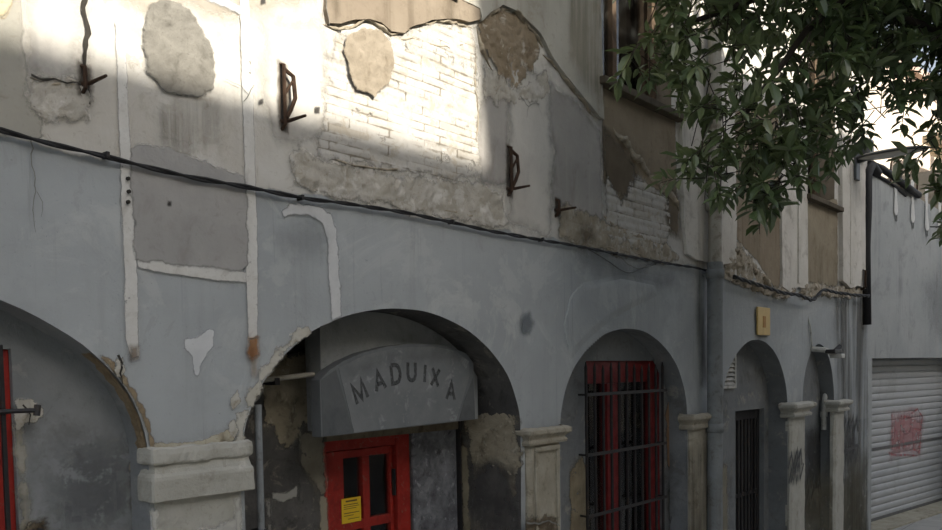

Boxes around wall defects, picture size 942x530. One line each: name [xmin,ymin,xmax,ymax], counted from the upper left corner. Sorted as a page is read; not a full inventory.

flaking render [289,7,596,229]
flaking render [559,127,679,264]
spalling [724,242,862,300]
corrosion [247,337,260,359]
flaking render [82,327,328,530]
peeling [461,413,523,530]